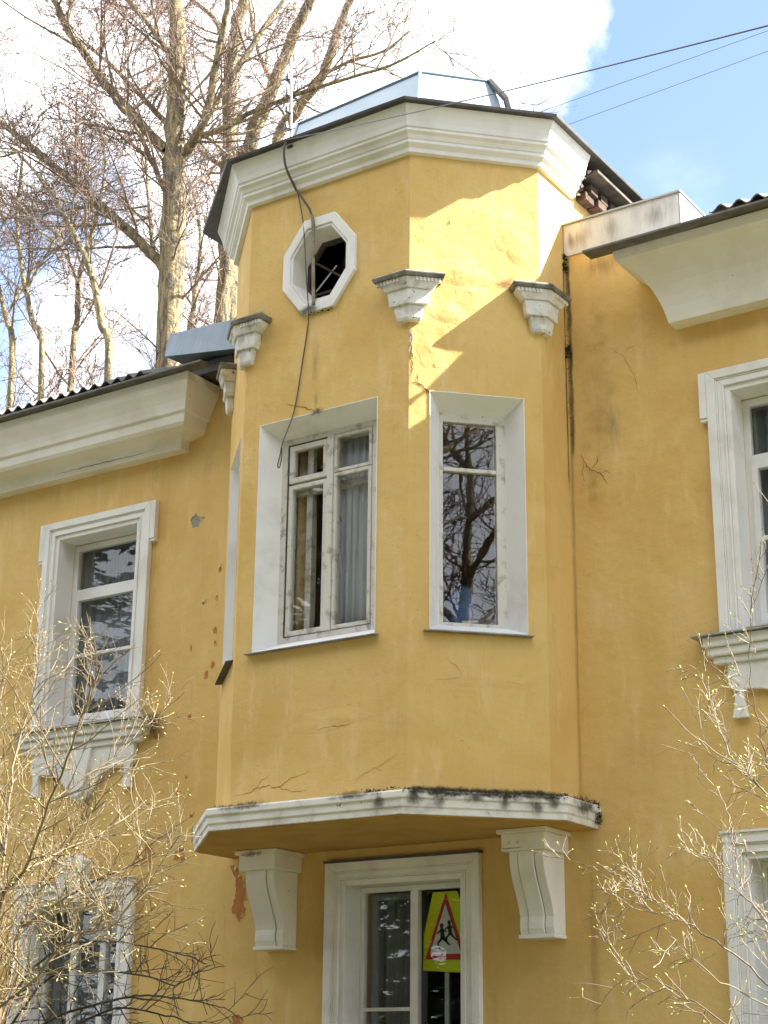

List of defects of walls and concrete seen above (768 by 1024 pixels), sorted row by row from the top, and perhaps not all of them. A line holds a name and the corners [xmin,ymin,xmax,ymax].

crack [56,450,151,475]
crack [581,455,609,484]
peeling [190,514,205,528]
crack [239,774,306,796]
peeling [230,865,247,922]